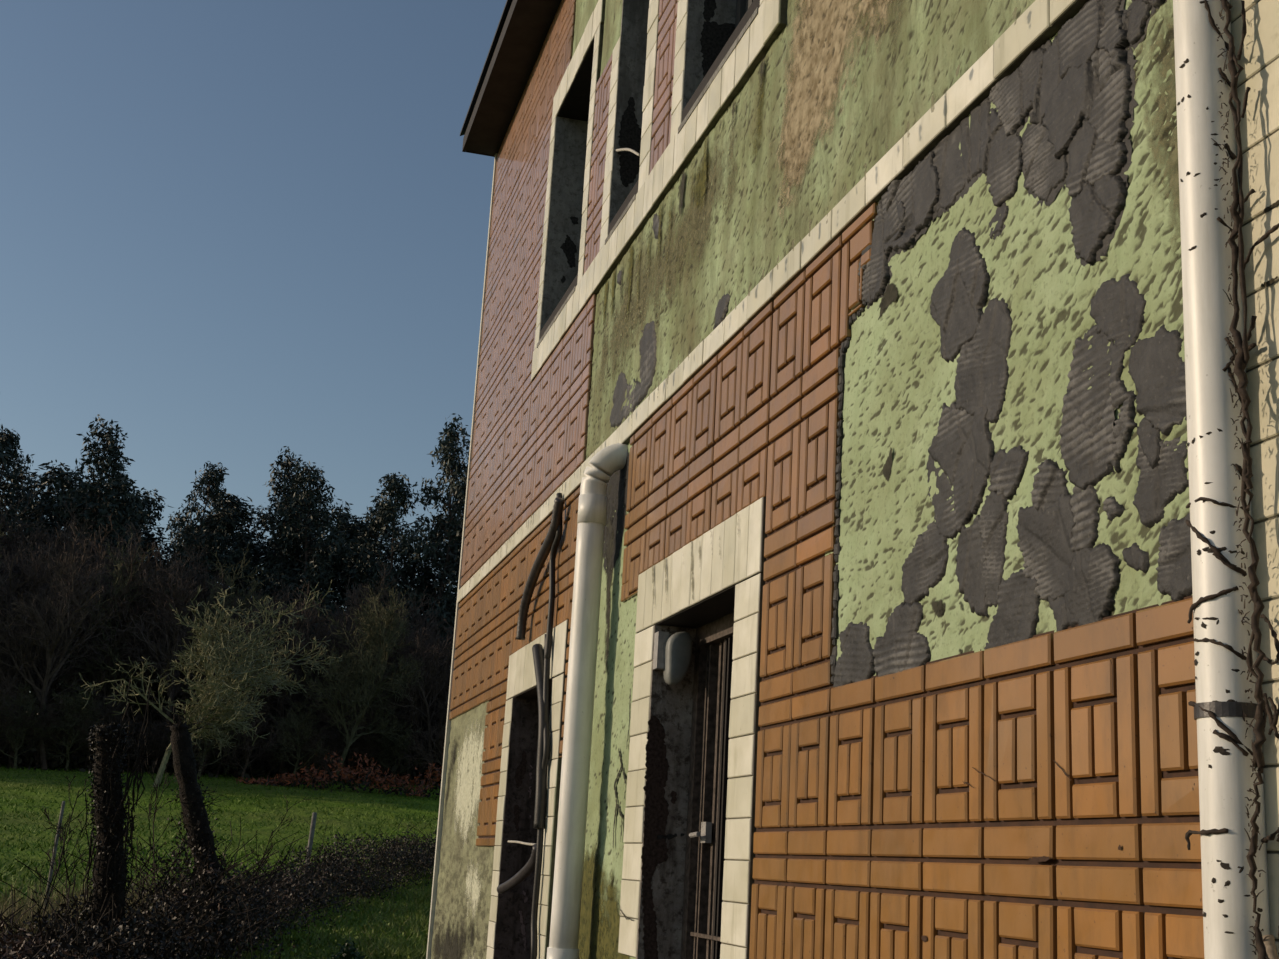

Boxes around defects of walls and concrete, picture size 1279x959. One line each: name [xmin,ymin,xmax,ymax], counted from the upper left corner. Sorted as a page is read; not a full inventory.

spalling [572,0,623,76]
water stain [601,59,765,377]
spalling [586,0,1035,459]
spalling [825,0,1193,688]
water stain [444,741,468,813]
spalling [584,510,637,934]
crack [613,688,631,847]
water stain [432,921,478,959]
water stain [578,798,629,959]